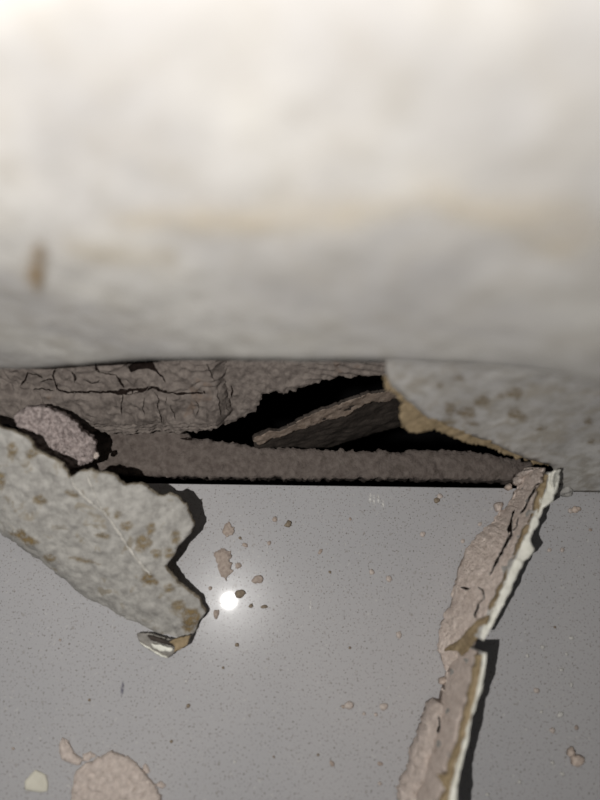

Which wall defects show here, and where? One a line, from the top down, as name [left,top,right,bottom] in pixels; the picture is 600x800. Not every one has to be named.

crack [21,359,233,422]